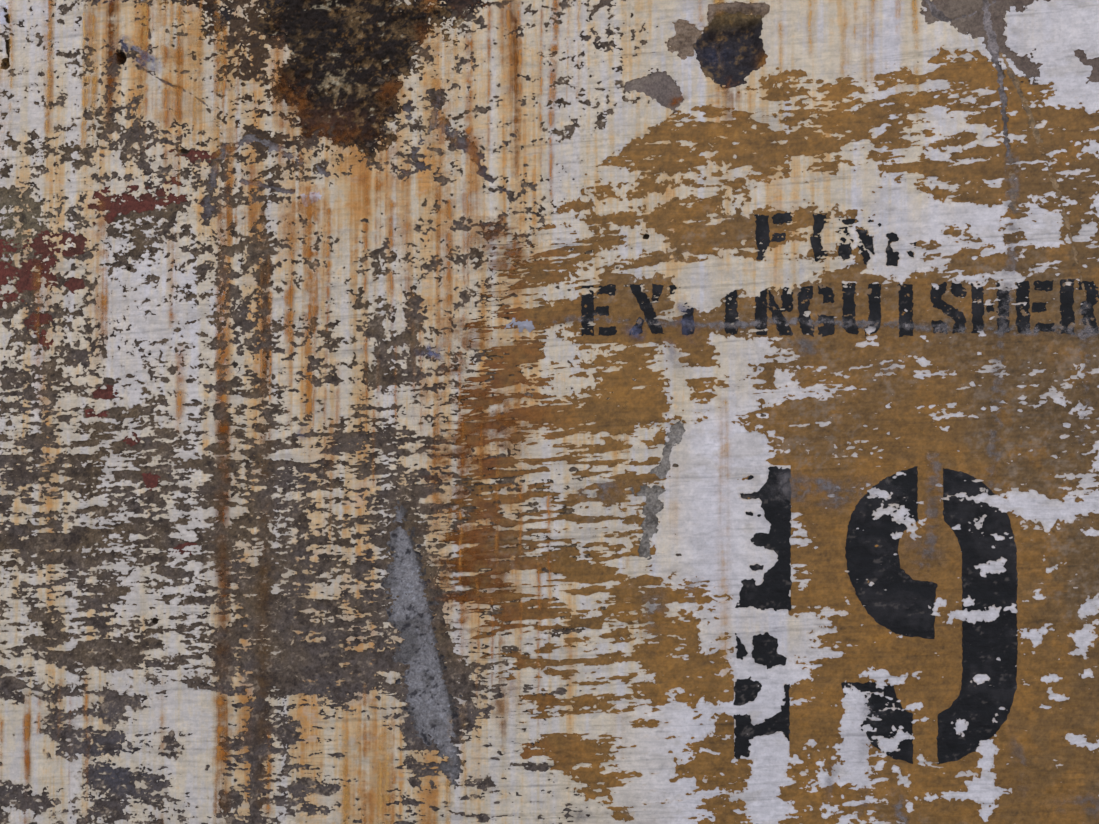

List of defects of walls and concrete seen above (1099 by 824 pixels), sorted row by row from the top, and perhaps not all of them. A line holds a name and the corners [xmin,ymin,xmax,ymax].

rust [164,86,199,135]
rust [488,4,522,95]
rust [539,0,579,177]
peeling [920,0,1099,114]
rust [285,188,330,355]
rust [305,372,338,425]
peeling [915,352,1099,577]
peeling [826,483,927,540]
peeling [928,555,1067,628]
peeling [1058,593,1099,679]
rust [216,697,227,760]
peeling [905,734,1013,822]